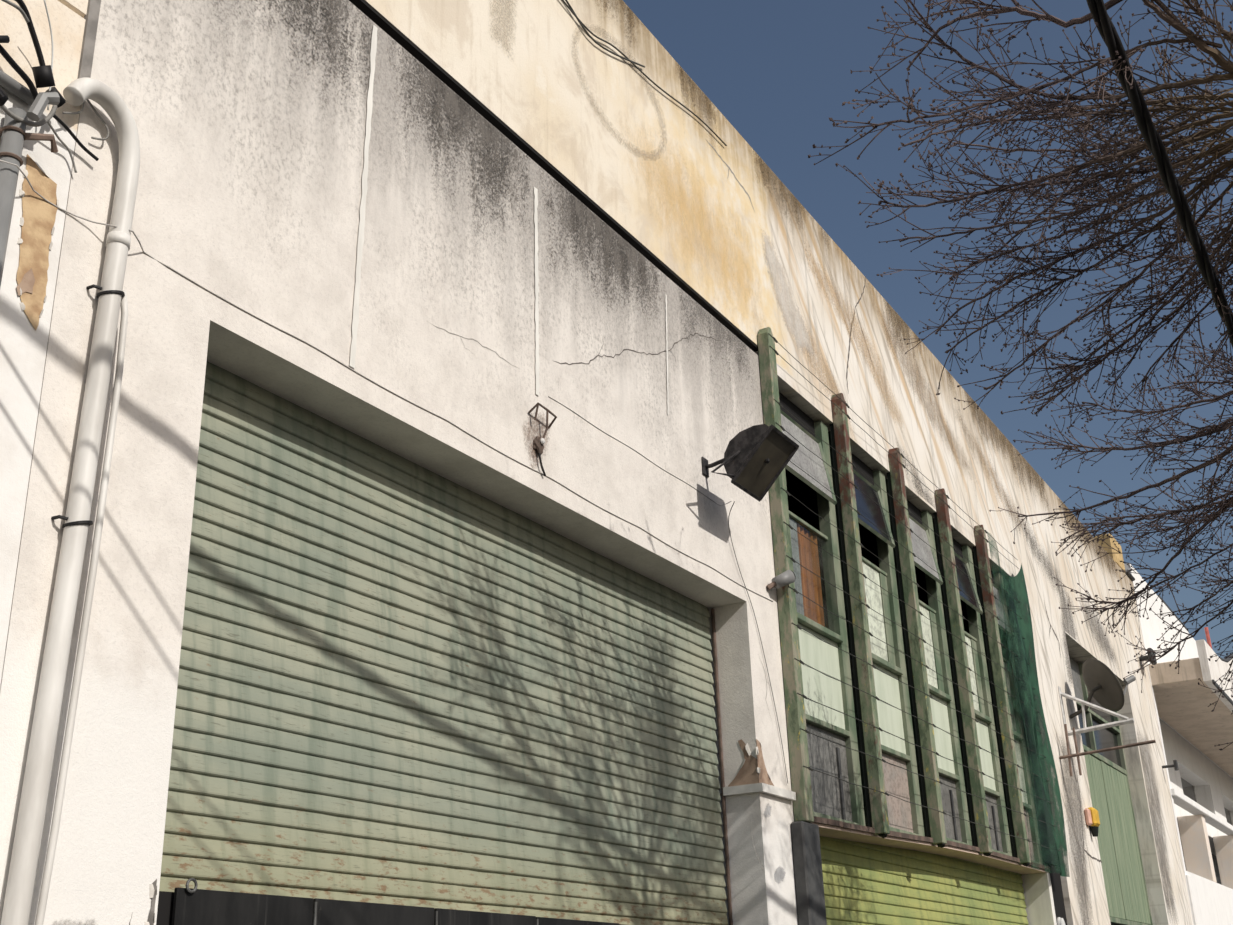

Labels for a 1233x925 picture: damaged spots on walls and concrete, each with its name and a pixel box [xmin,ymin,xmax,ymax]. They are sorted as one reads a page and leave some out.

damp [275,0,372,93]
damp [398,47,528,225]
damp [543,173,659,313]
crack [555,333,722,365]
damp [681,297,746,362]